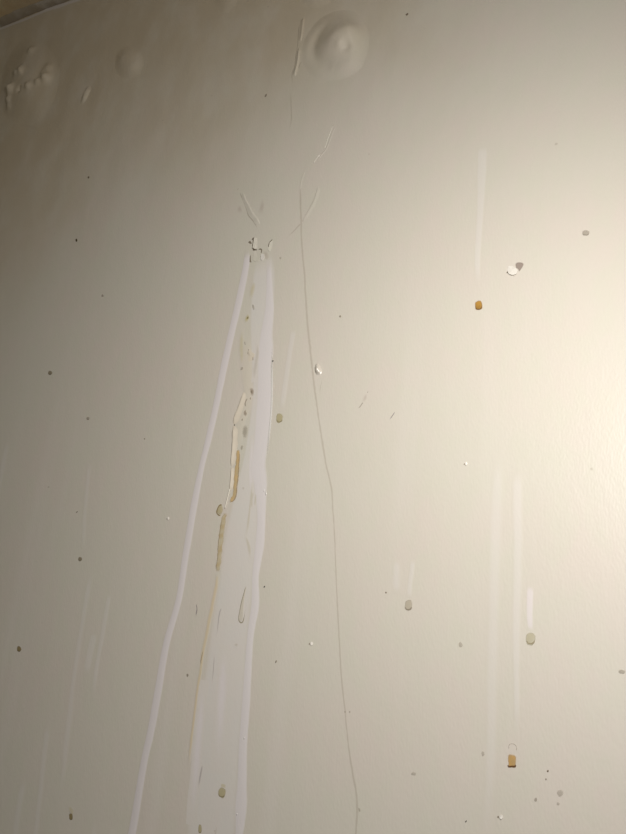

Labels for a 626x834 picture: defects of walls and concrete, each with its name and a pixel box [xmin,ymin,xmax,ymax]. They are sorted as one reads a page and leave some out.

water stain [128,248,276,834]
crack [286,171,359,834]